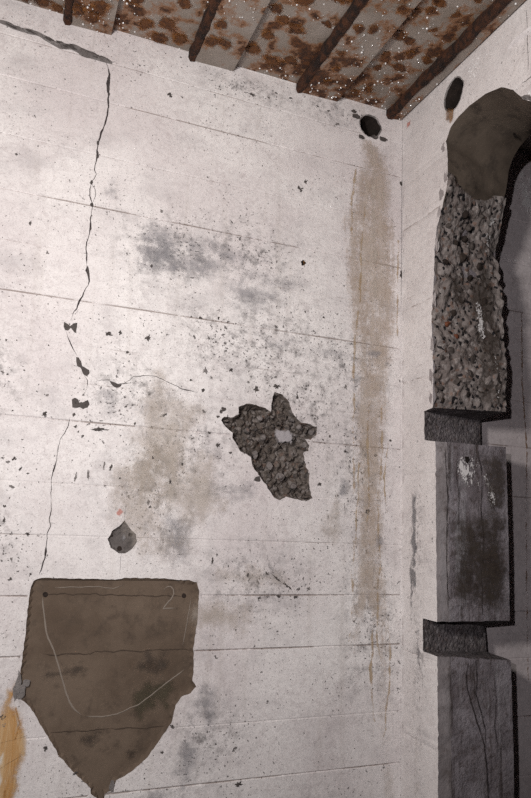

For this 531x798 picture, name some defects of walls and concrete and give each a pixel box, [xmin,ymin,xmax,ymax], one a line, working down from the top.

corrosion [22,0,112,21]
corrosion [139,18,187,45]
corrosion [205,20,232,50]
corrosion [245,30,297,66]
corrosion [373,31,432,72]
corrosion [397,0,446,16]
spalling [429,170,507,412]
water stain [350,142,399,619]
spalling [216,384,322,501]
peeling [108,507,137,568]
water stain [369,634,391,737]
corrosion [0,671,25,798]